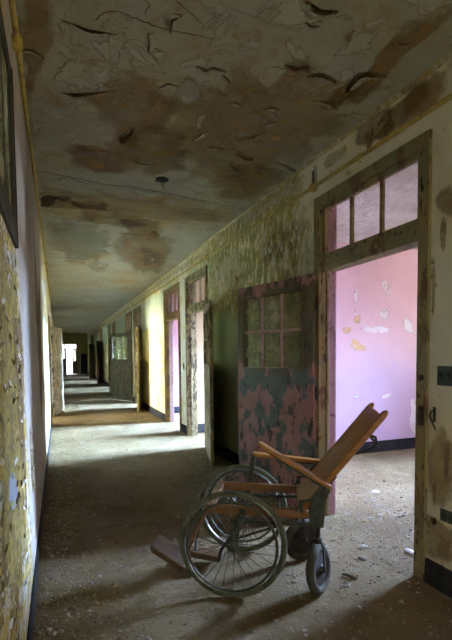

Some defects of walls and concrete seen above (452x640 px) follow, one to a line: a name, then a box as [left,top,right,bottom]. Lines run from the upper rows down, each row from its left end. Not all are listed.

crack [95,0,213,39]
peeling [304,1,339,31]
leakage [69,16,446,199]
peeling [284,64,337,84]
peeling [346,72,386,93]
leakage [51,192,217,273]
peeling [342,287,389,351]
peeling [0,213,35,640]